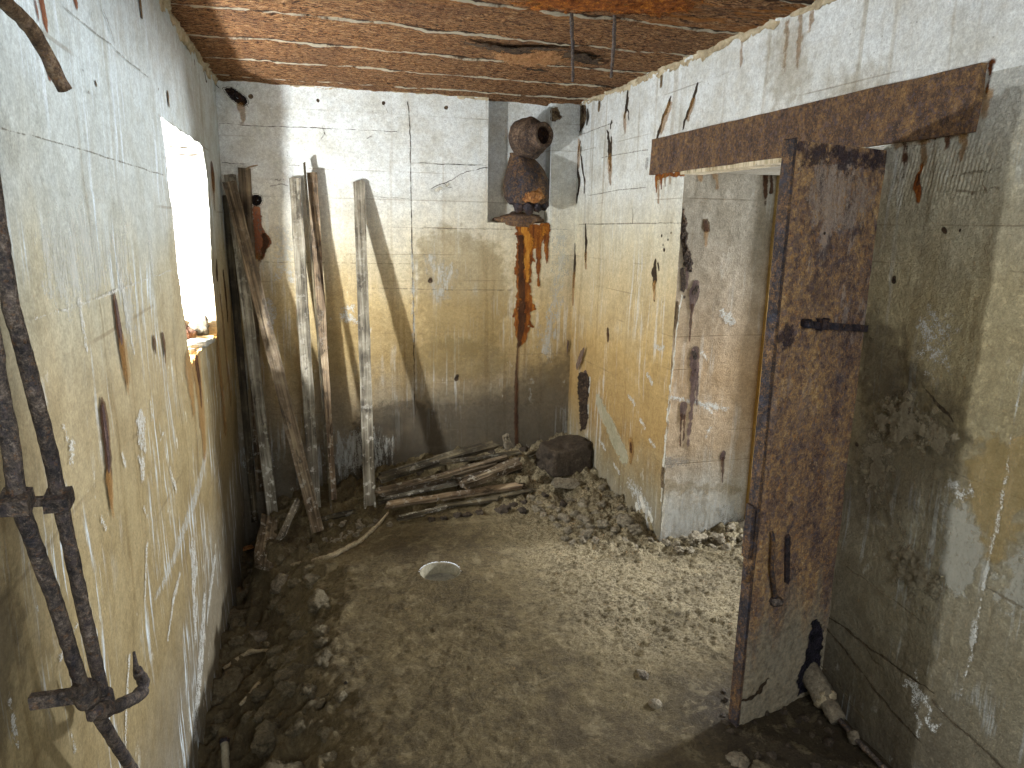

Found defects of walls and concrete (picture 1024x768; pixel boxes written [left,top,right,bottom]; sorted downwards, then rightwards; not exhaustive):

corrosion [252,206,272,261]
corrosion [655,172,685,193]
corrosion [902,142,923,203]
corrosion [512,223,551,446]
corrosion [100,397,113,508]
leakage [966,433,1024,562]